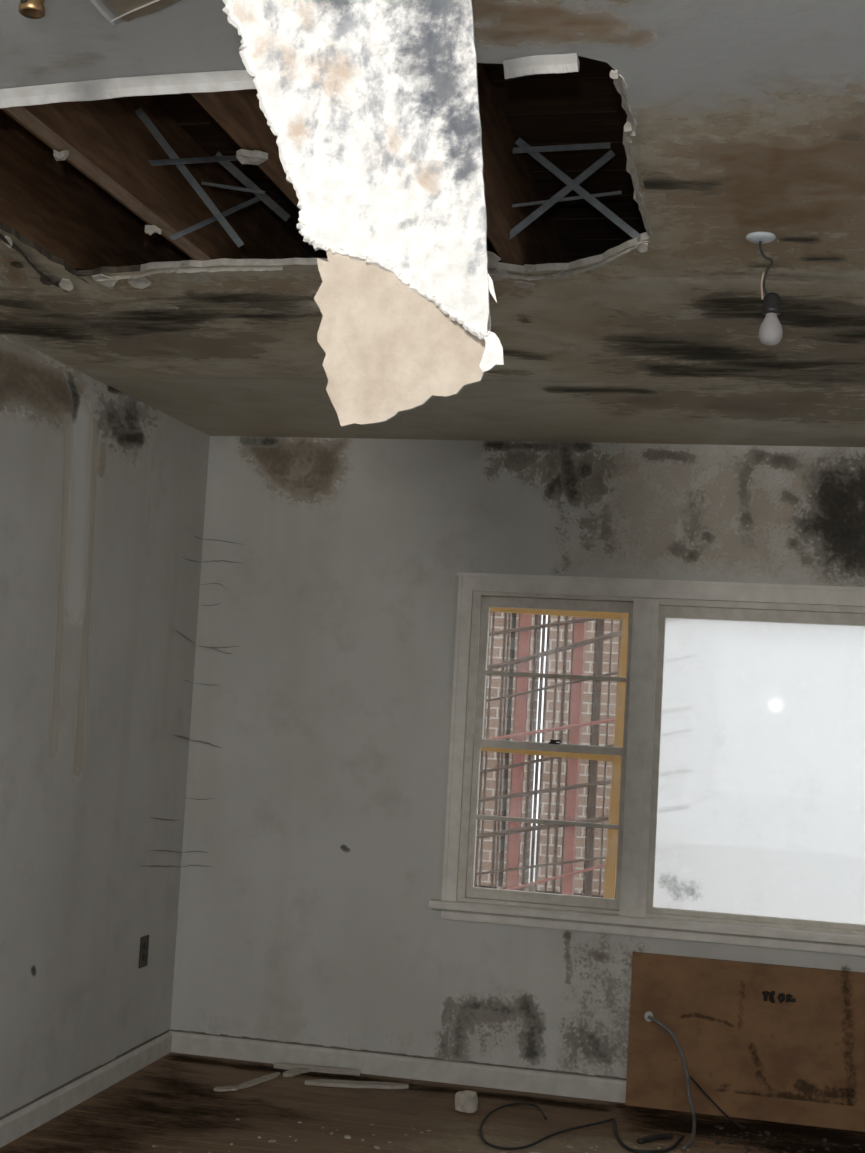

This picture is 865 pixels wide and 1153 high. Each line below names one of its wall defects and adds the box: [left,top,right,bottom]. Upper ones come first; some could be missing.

damp [639,87,865,273]
peeling [92,274,151,289]
peeling [487,251,507,280]
damp [544,291,865,423]
damp [0,255,322,622]
damp [240,436,349,503]
damp [643,449,865,581]
crack [182,536,243,606]
crack [176,630,241,654]
crack [174,735,222,749]
crack [143,850,212,867]
damp [437,994,545,1065]